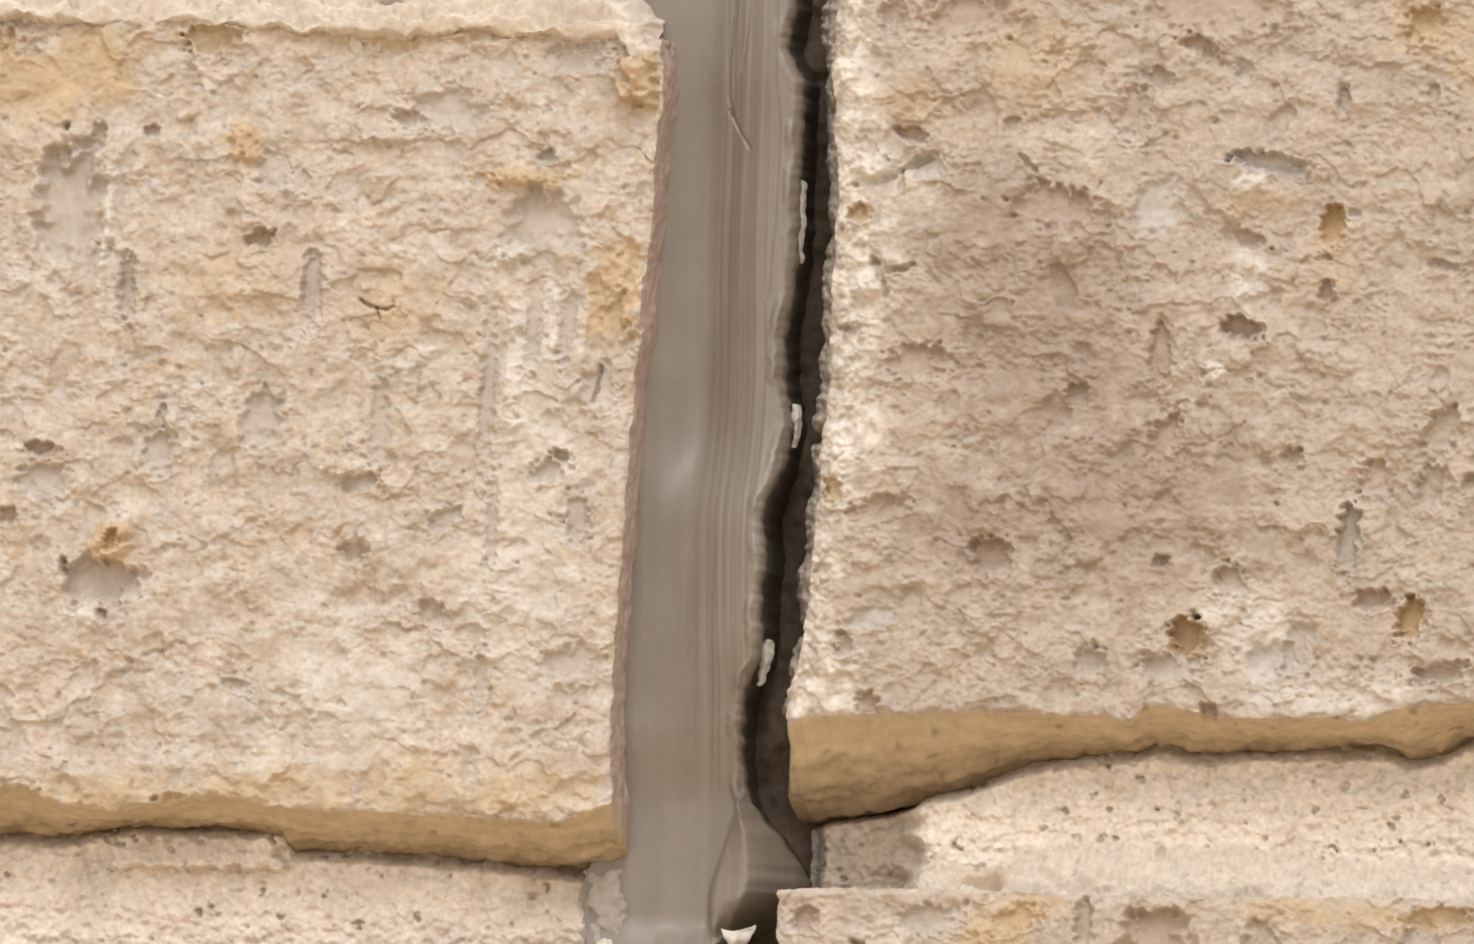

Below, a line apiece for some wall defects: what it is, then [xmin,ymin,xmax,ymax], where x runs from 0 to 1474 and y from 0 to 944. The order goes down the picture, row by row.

crack [725,0,943,878]
crack [747,927,779,944]